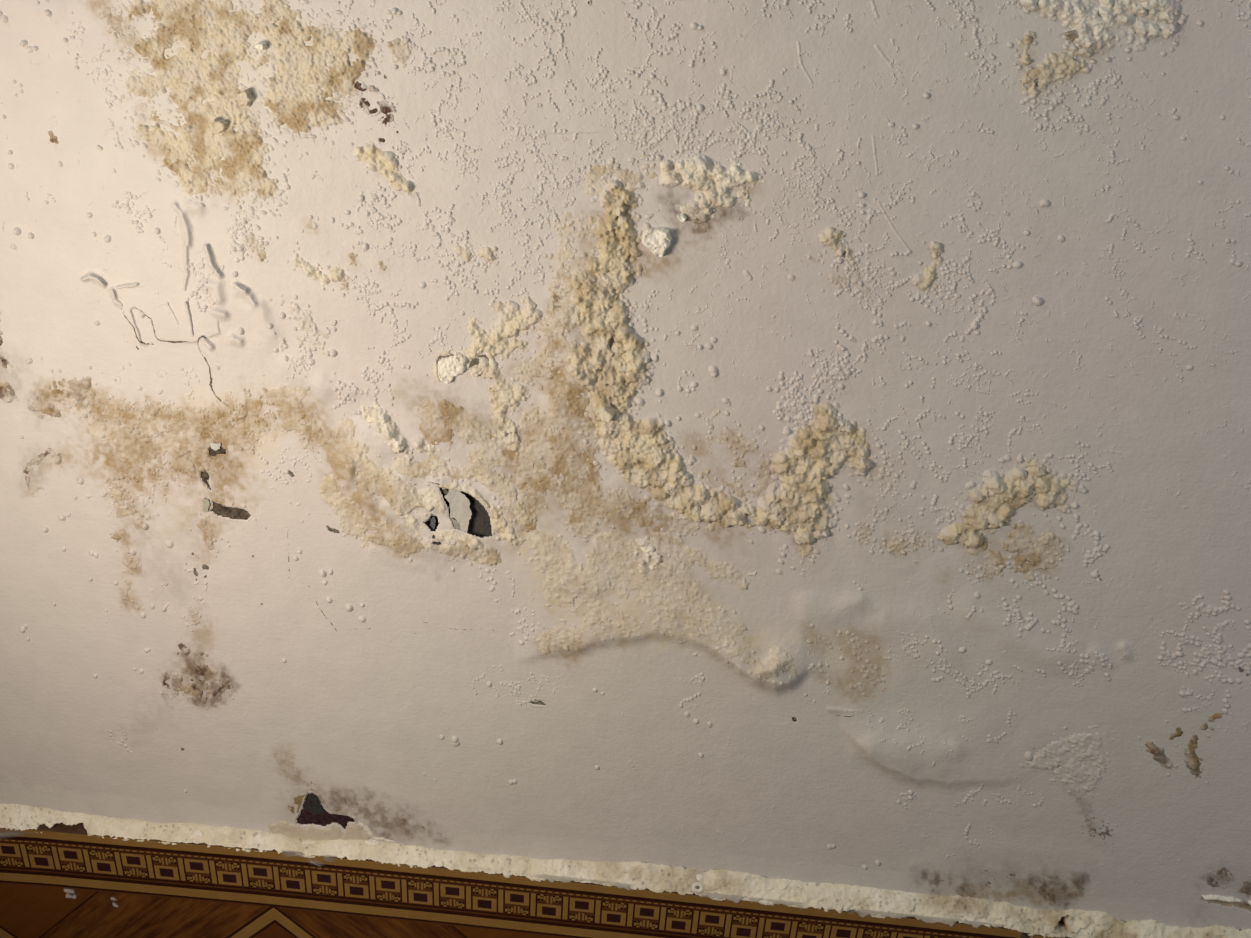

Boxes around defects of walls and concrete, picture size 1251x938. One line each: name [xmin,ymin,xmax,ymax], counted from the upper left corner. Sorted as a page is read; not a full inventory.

flaking render [97,0,419,231]
crack [121,308,239,415]
leakage [47,228,593,625]
flaking render [80,144,1088,686]
leakage [611,287,659,421]
leakage [472,404,1089,708]
peeling [0,782,1251,931]